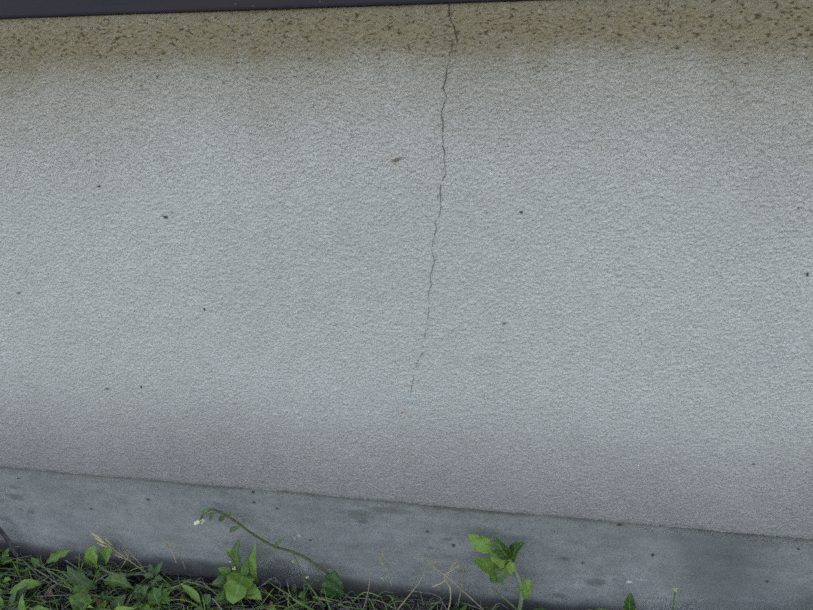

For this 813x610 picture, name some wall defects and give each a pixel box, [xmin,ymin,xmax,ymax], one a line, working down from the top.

damp [0,0,813,79]
crack [410,4,458,398]